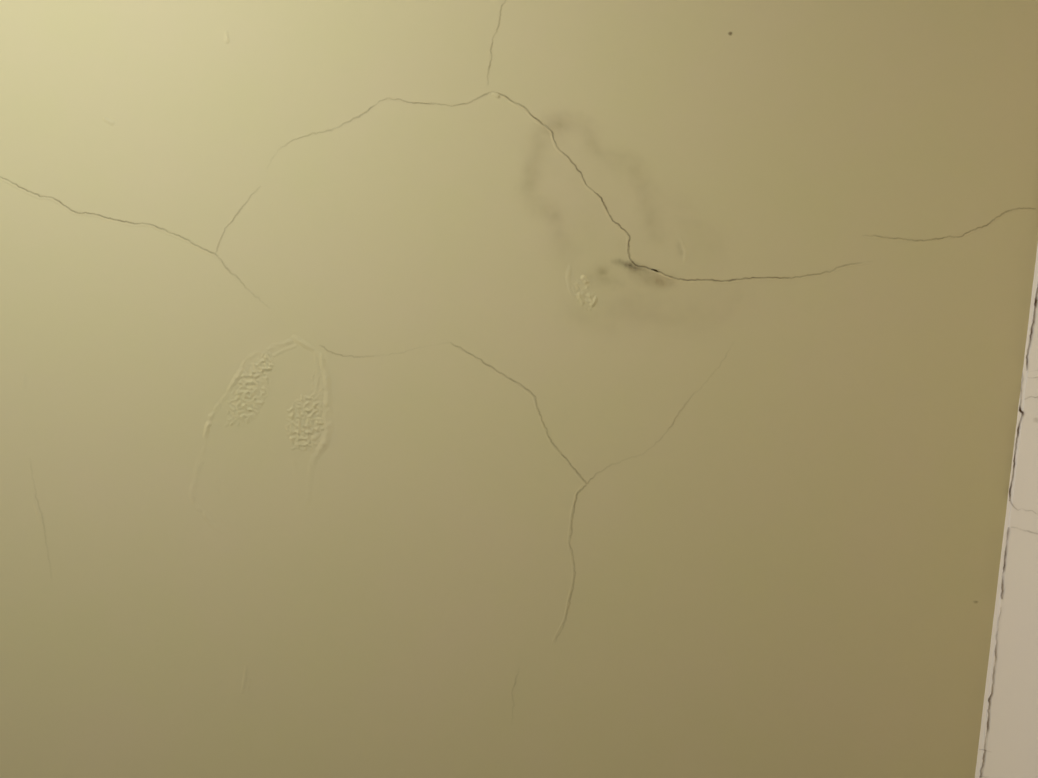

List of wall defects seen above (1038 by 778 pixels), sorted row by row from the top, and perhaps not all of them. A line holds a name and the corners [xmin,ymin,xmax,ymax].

crack [1026,287,1038,366]
crack [1009,407,1024,497]
crack [980,685,993,776]